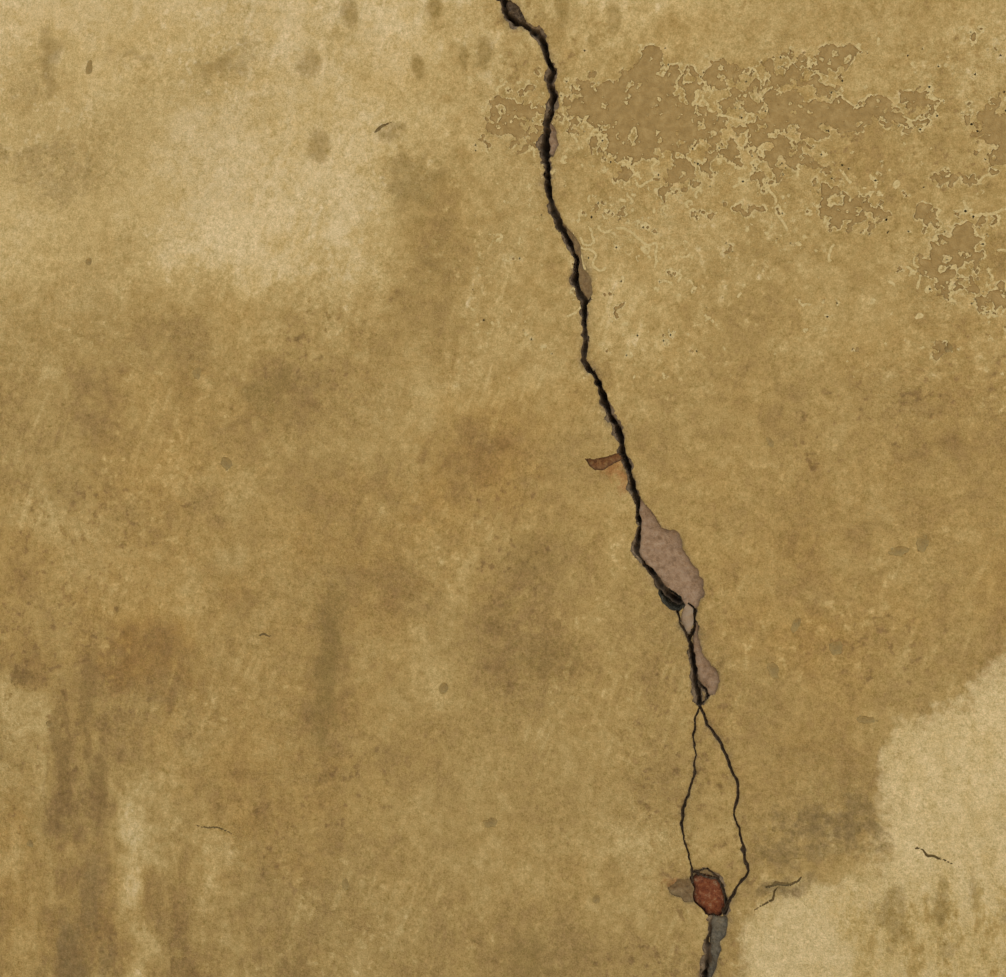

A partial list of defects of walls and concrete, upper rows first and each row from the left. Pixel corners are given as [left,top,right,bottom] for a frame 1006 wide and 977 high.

peeling [477,32,1006,341]
damp [40,637,119,977]
damp [303,556,356,770]
crack [486,0,802,977]
flaking render [639,500,720,695]